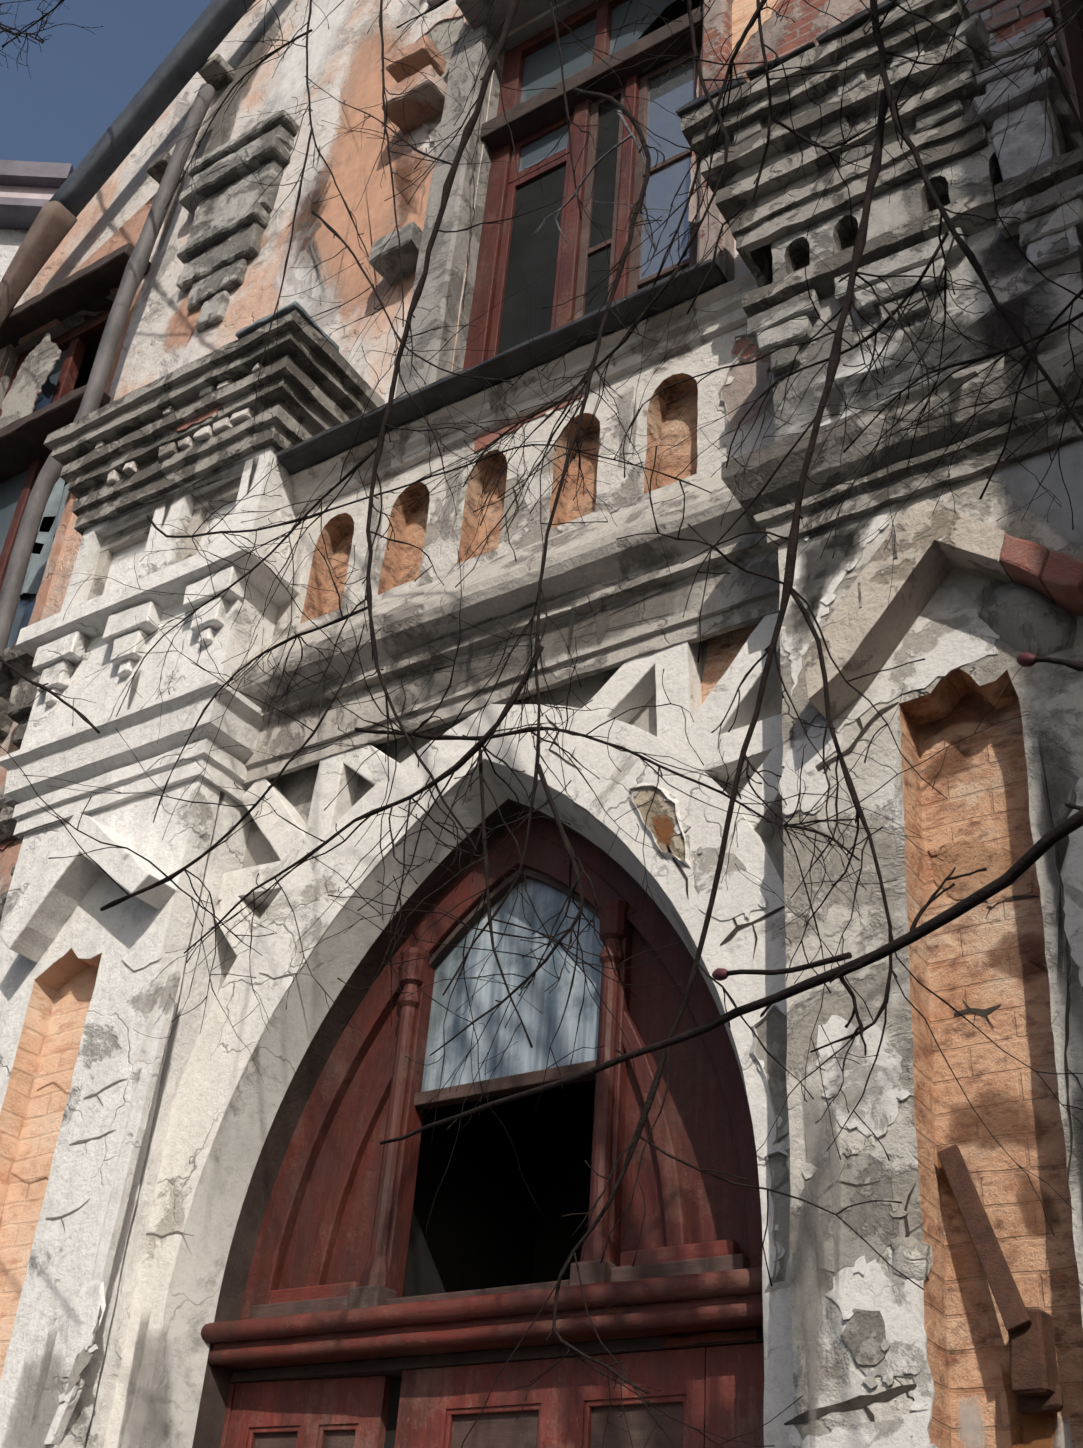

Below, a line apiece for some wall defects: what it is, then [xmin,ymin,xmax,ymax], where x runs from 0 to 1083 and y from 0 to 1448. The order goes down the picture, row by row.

spalling [732,0,781,54]
peeling [247,0,473,311]
peeling [781,502,899,697]
peeling [778,588,1000,816]
peeling [628,782,769,921]
peeling [1063,778,1083,986]
crack [36,1078,128,1152]
water stain [952,1095,1035,1146]
crack [12,1172,90,1231]
crack [146,1230,193,1238]
peeling [749,1005,922,1389]
water stain [1020,1177,1058,1233]